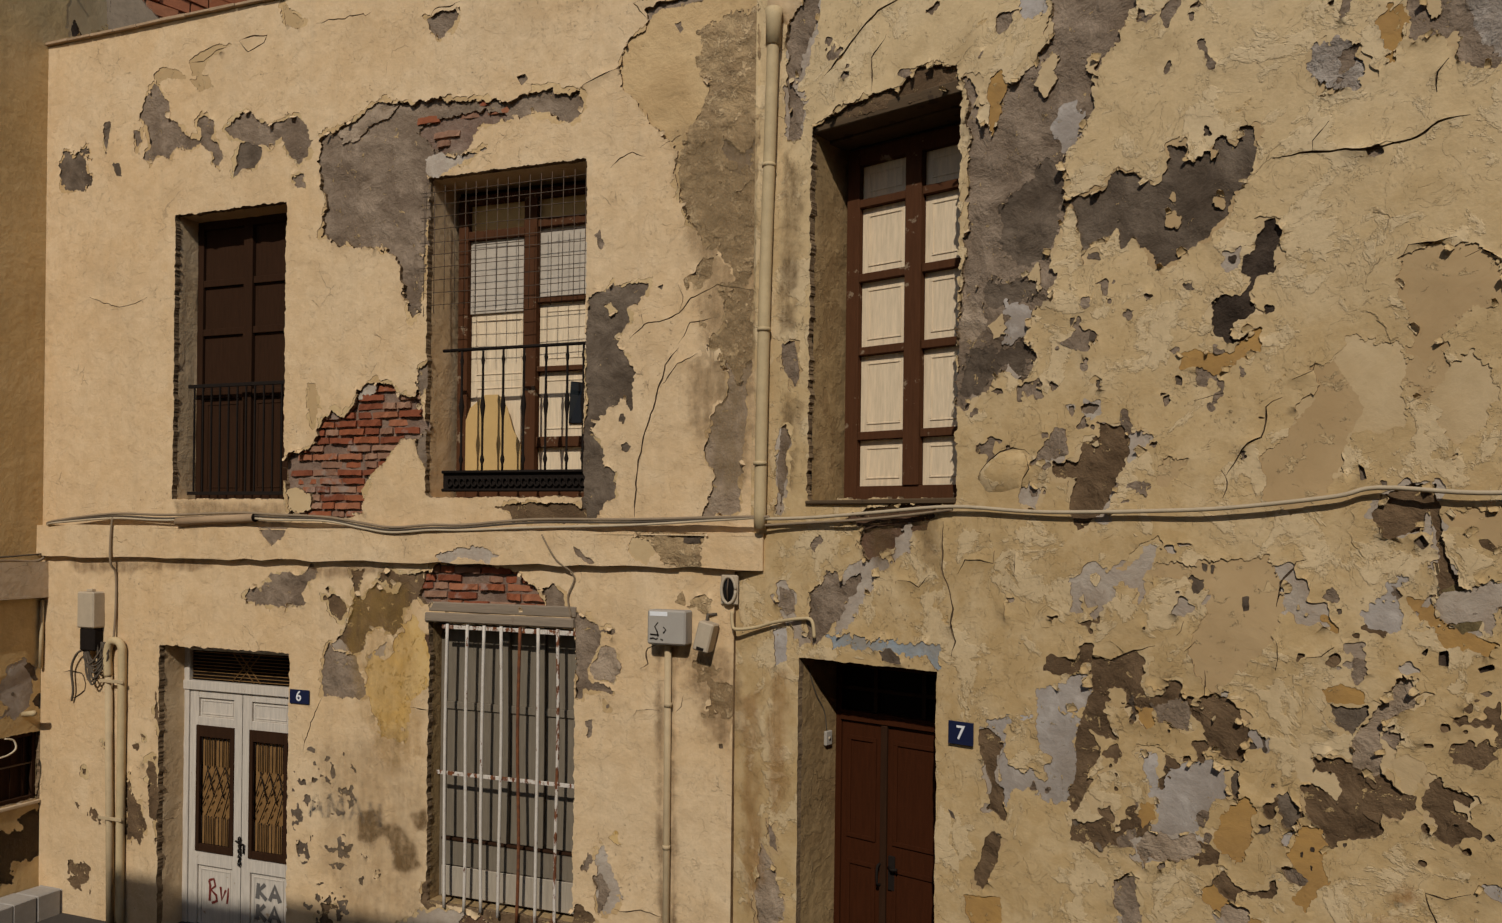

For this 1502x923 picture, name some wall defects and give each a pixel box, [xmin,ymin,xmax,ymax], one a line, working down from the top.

spalling [259,360,433,546]
spalling [134,43,588,326]
spalling [495,277,663,526]
crack [635,358,671,503]
spalling [618,0,761,568]
crack [640,284,748,330]
spalling [783,0,1287,532]
crack [1286,73,1452,157]
spalling [1304,0,1502,97]
spalling [241,545,622,743]
peeling [964,242,1502,923]
damp [0,803,39,886]